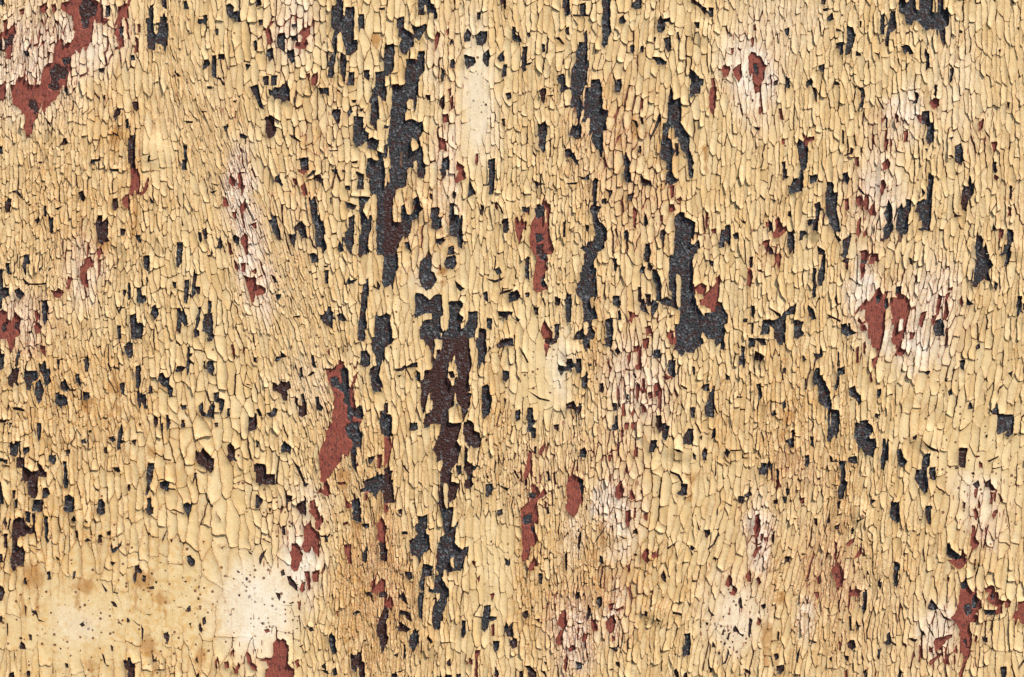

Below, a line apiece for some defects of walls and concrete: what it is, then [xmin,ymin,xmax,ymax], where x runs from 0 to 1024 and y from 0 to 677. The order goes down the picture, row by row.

crack [691,0,706,14]
crack [812,74,856,102]
crack [631,107,661,140]
peeling [0,0,790,677]
peeling [725,0,1024,677]
crack [504,347,550,407]
crack [292,459,306,483]
crack [670,449,683,483]
crack [148,473,221,543]
crack [565,526,626,584]
crack [777,601,832,663]
crack [838,601,860,631]